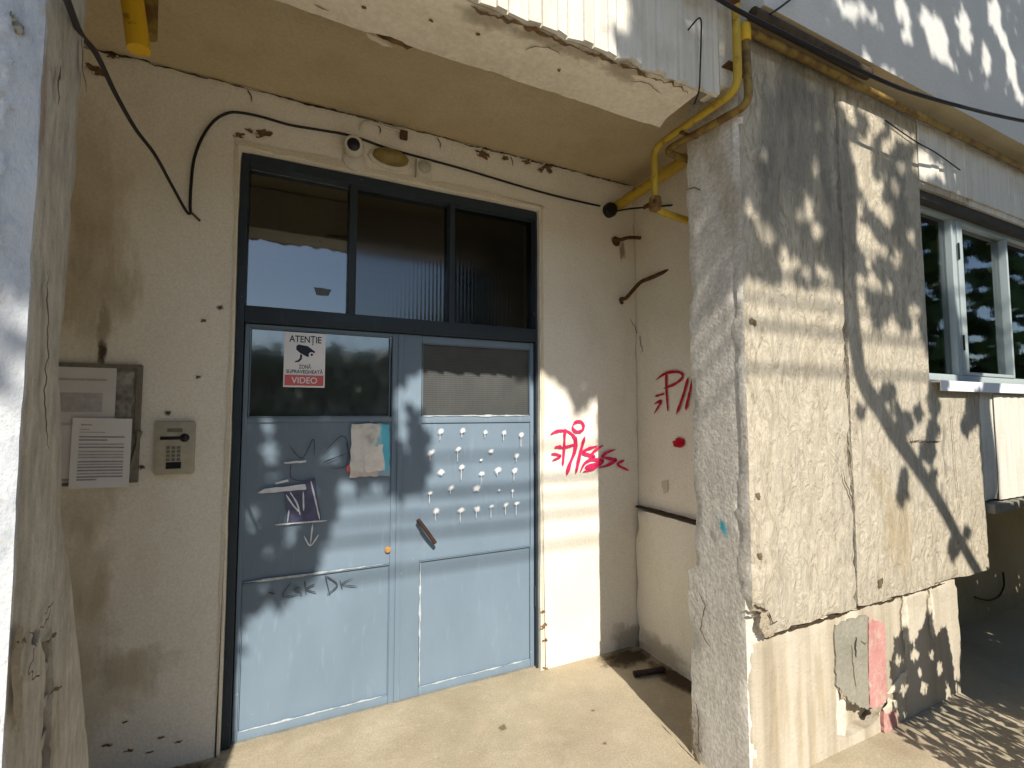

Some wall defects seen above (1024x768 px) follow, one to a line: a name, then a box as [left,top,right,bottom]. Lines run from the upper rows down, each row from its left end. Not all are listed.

spalling [472,6,688,93]
crack [764,583,945,639]
crack [16,603,62,751]
spalling [840,670,908,724]